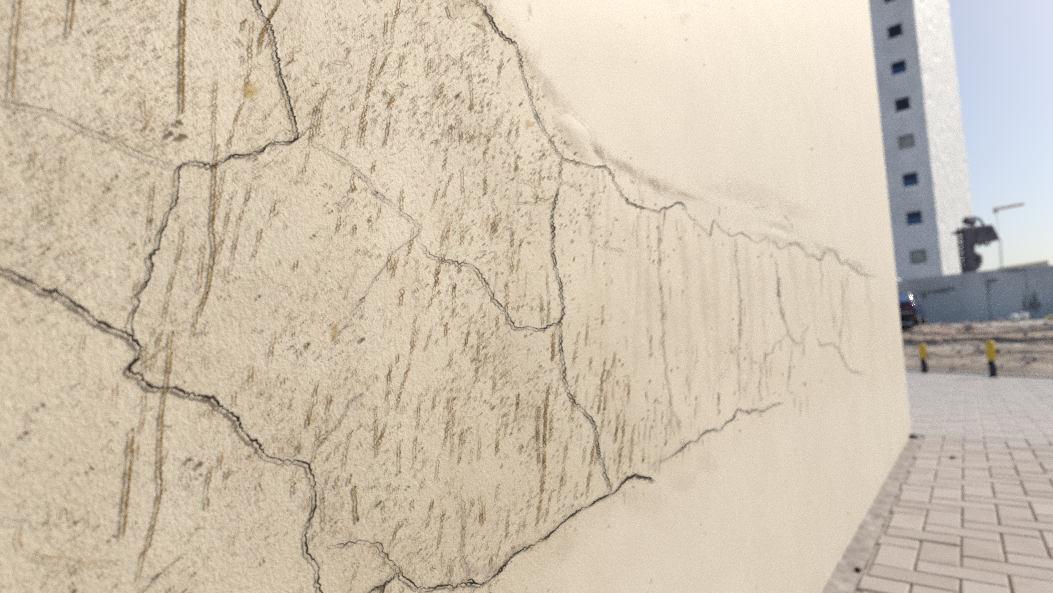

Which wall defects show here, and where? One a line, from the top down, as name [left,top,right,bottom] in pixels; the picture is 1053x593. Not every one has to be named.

spalling [167,120,188,139]
crack [777,241,874,293]
crack [0,0,804,593]